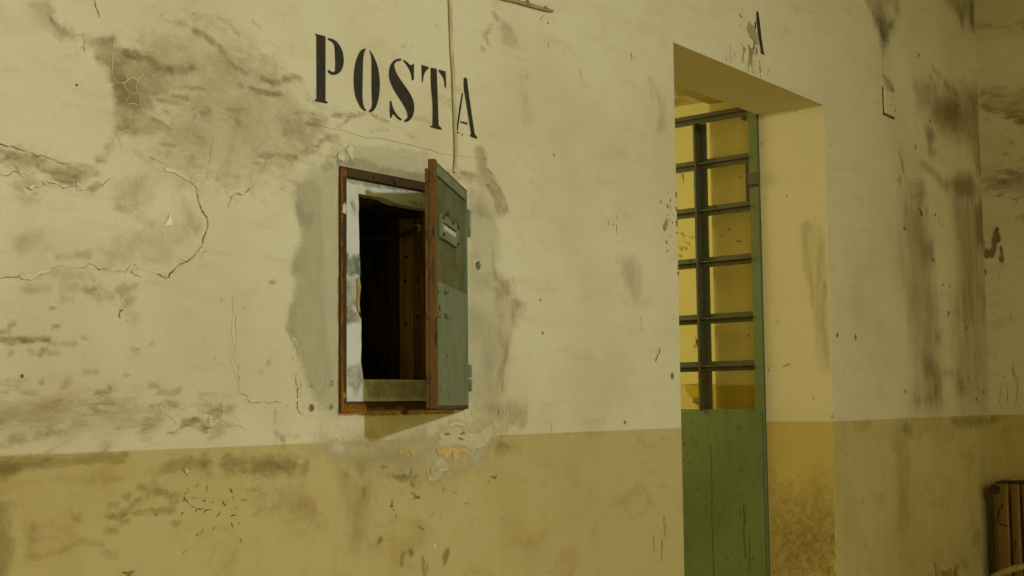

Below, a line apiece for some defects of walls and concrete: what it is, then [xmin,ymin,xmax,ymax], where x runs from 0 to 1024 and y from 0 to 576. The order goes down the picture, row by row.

crack [111,38,189,145]
crack [0,144,109,197]
crack [3,169,209,280]
peeling [984,227,1004,275]
spalling [429,410,499,460]